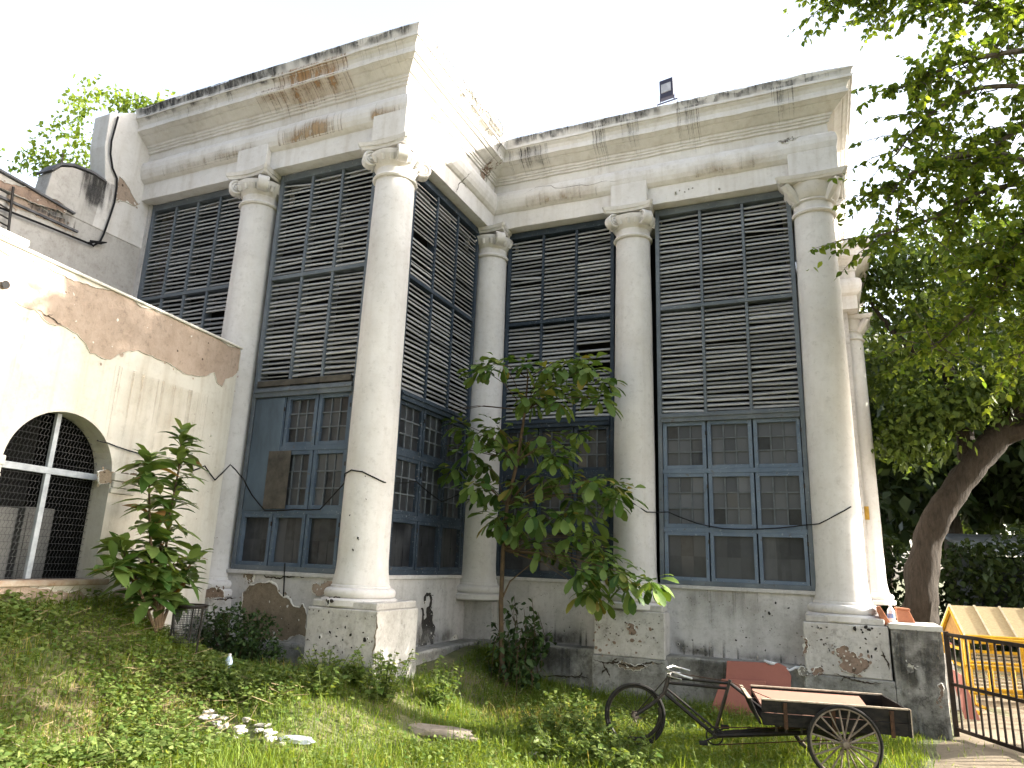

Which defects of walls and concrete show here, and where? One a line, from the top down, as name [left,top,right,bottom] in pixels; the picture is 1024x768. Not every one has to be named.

rust [268,54,346,103]
water stain [516,108,657,160]
water stain [85,171,107,204]
peeling [116,176,139,209]
peeling [0,250,241,392]
flaking render [205,569,373,663]
crack [543,658,663,680]
flaking render [779,606,890,677]
water stain [896,631,938,687]